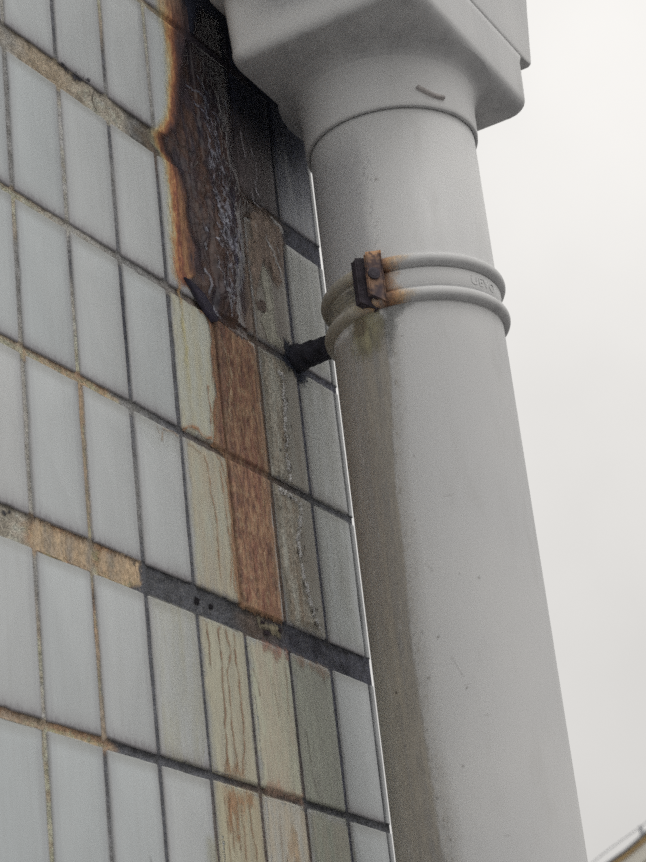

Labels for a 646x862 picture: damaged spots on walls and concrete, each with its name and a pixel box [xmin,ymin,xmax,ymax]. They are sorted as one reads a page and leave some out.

corrosion [30,518,140,585]
corrosion [151,0,252,299]
corrosion [183,263,283,623]
leakage [163,0,307,599]
corrosion [375,257,404,308]